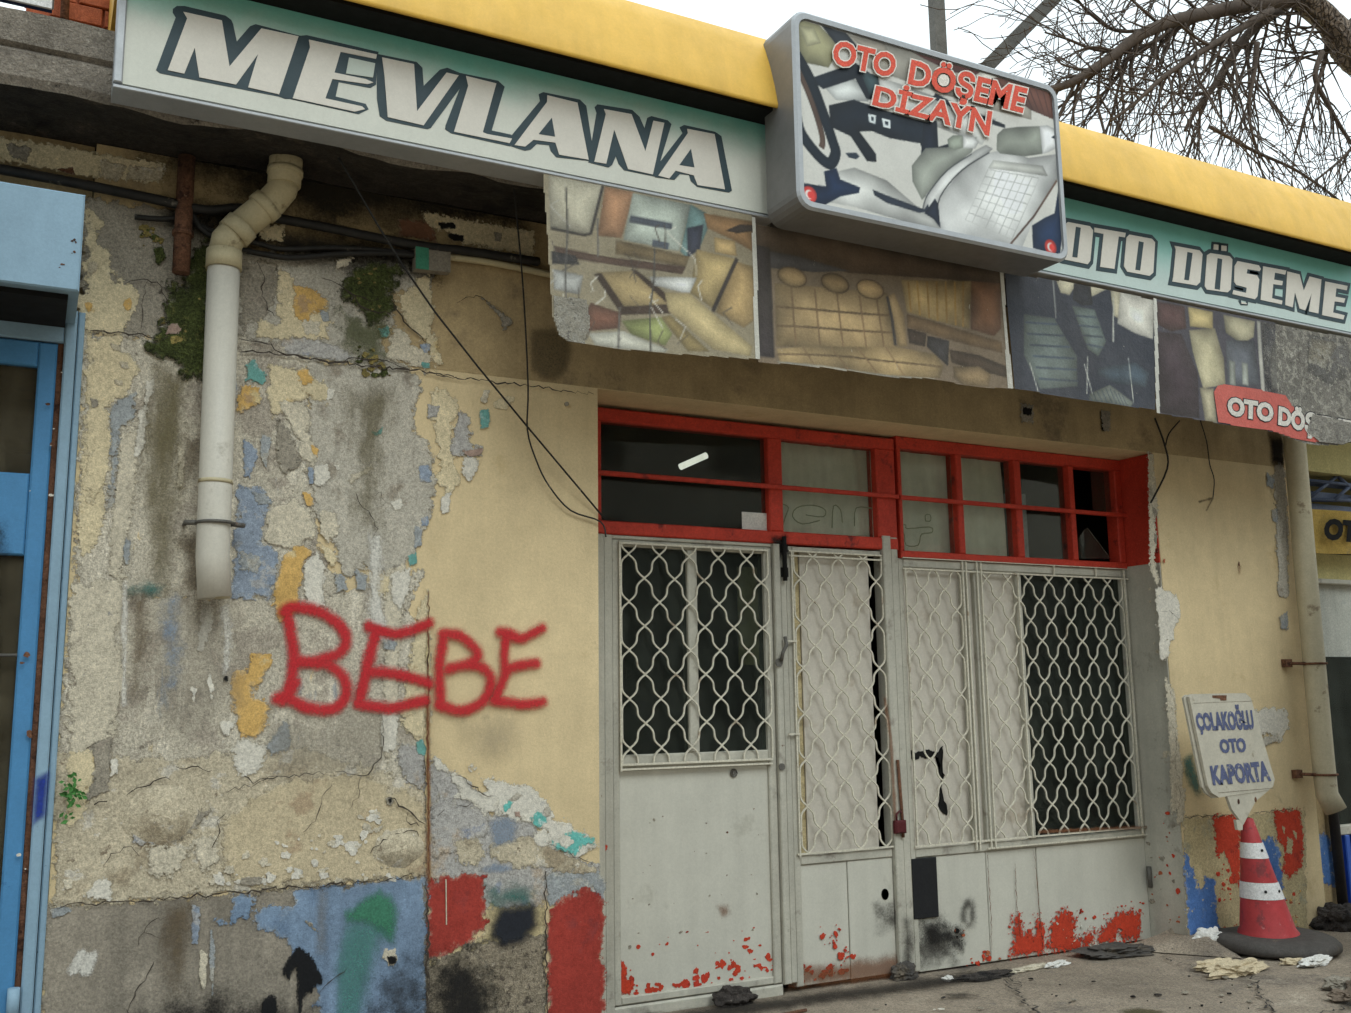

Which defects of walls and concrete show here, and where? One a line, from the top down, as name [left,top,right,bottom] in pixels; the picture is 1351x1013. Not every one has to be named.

peeling [0,135,167,184]
crack [239,262,593,395]
flaking render [47,196,601,1013]
peeling [1146,451,1168,661]
crack [48,591,489,1013]
peeling [966,677,1241,966]
crack [997,968,1041,1013]